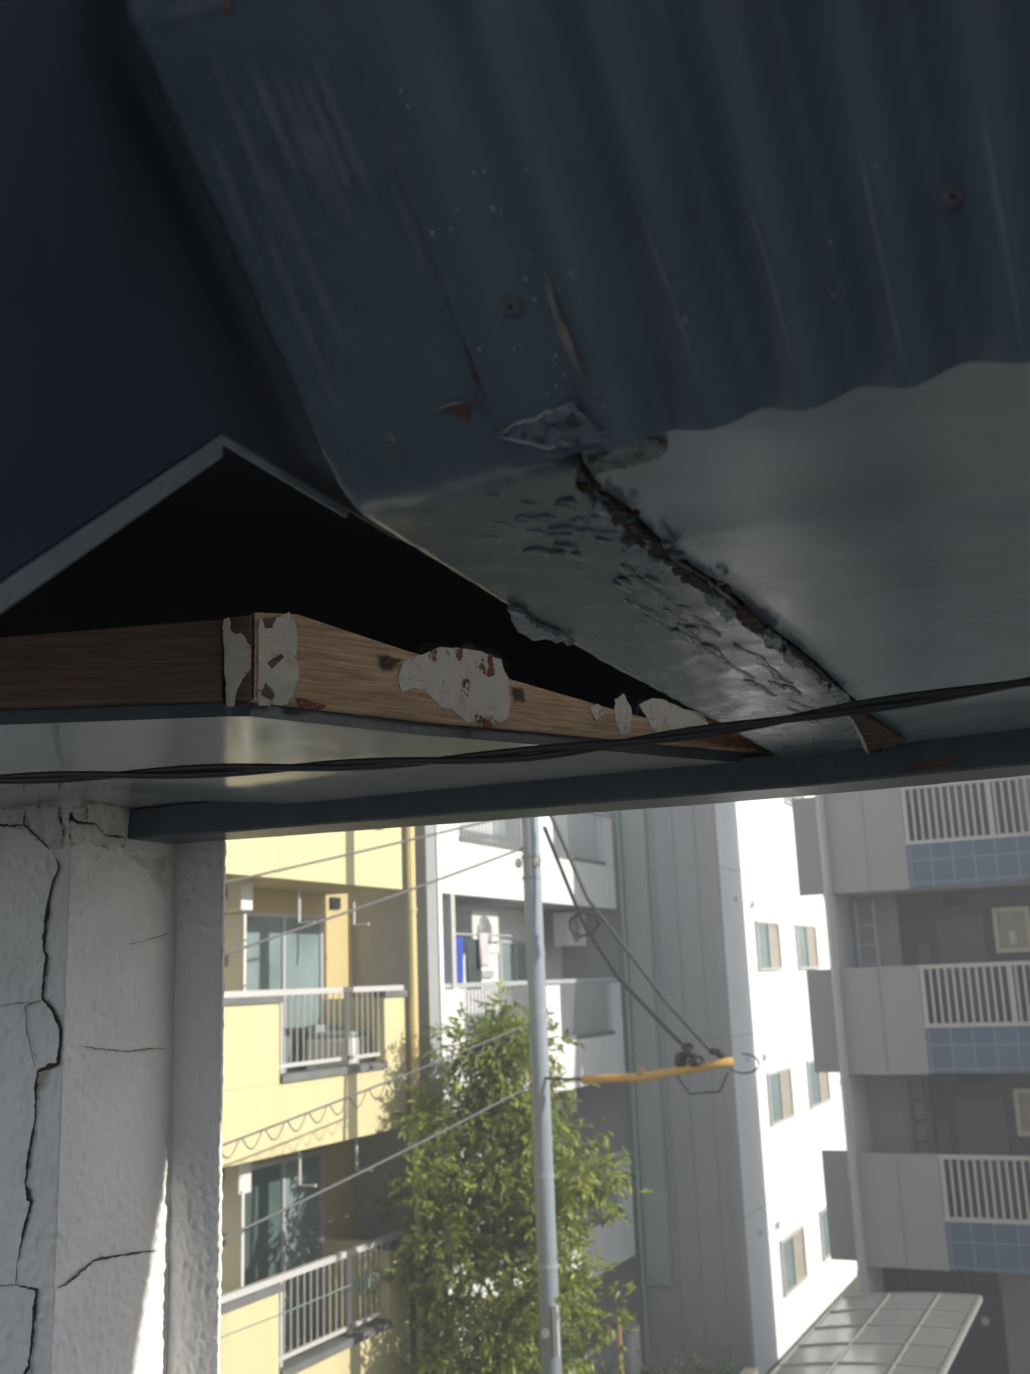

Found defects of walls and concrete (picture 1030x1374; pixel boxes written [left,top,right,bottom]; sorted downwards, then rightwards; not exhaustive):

peeling [497,254,668,475]
peeling [222,612,327,711]
peeling [398,647,510,731]
peeling [508,605,575,646]
peeling [589,694,708,736]
crack [0,850,167,1374]